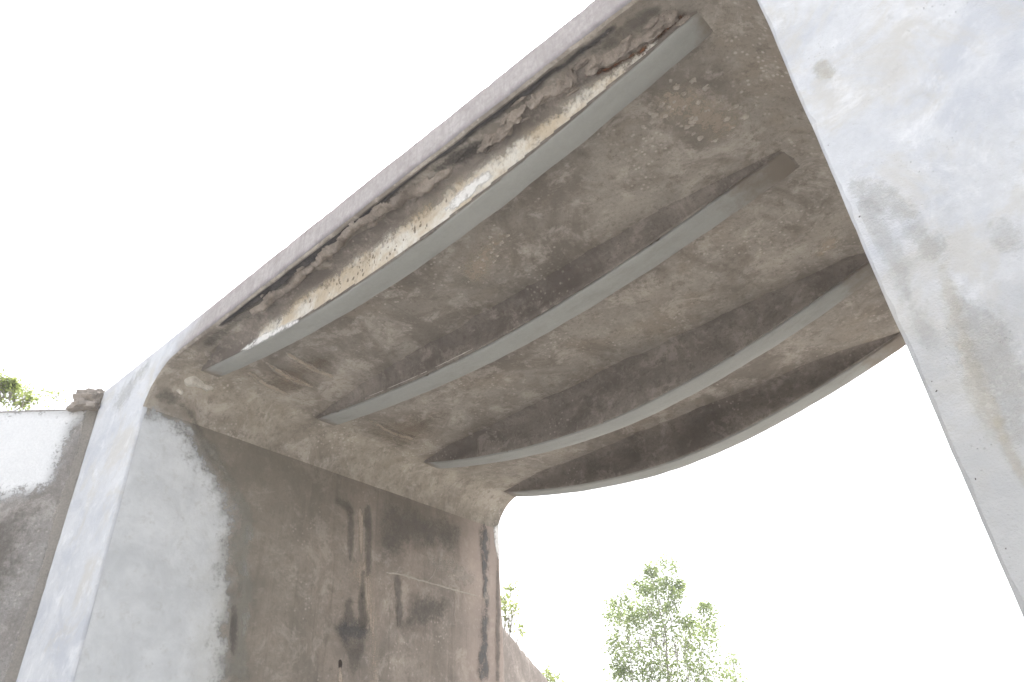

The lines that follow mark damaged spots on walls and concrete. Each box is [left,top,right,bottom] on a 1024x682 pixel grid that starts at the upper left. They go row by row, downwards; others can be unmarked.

spalling [477,10,691,153]
spalling [249,168,453,314]
leakage [336,507,378,680]
leakage [434,524,500,680]